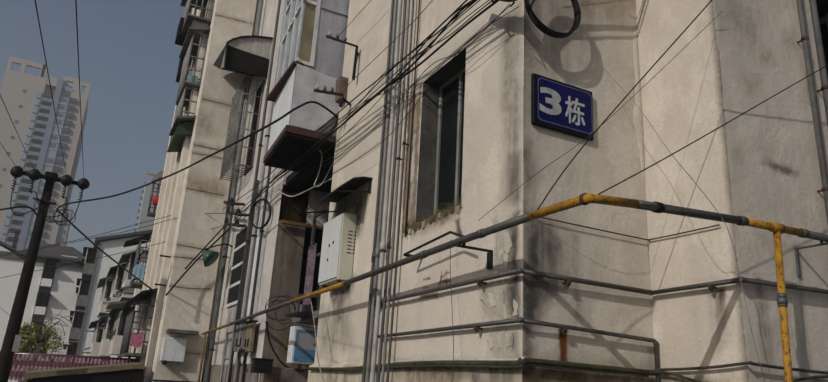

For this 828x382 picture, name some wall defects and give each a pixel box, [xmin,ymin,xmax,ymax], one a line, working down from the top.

peeling [493,220,516,272]
water stain [510,217,555,319]
peeling [480,285,535,354]